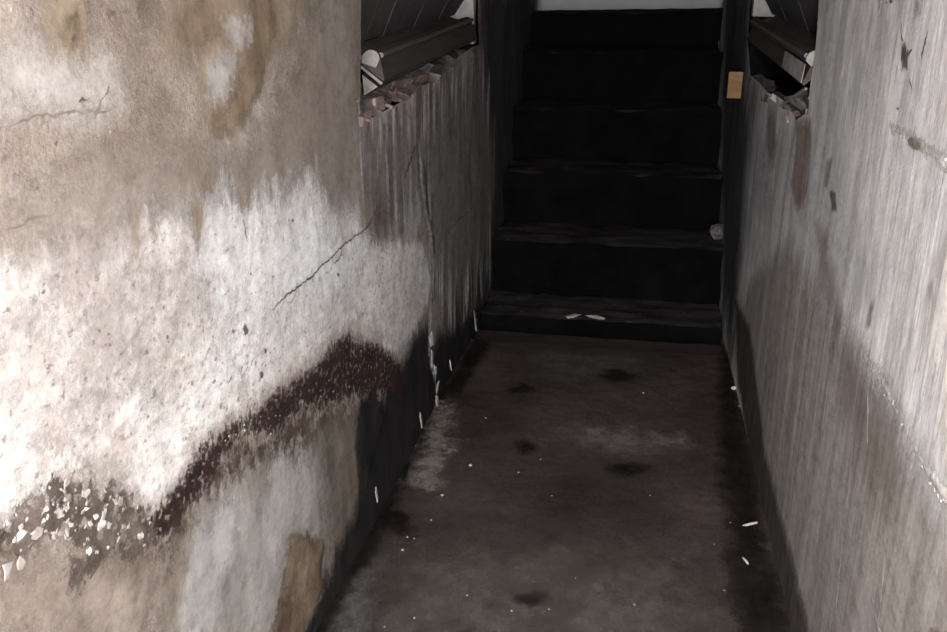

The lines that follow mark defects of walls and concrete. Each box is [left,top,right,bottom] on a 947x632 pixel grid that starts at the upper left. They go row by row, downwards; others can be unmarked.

crack [7,86,114,129]
spalling [358,49,475,127]
spalling [750,74,810,126]
crack [266,203,380,318]
leakage [0,0,734,632]
flaking render [862,346,947,504]
flaking render [0,471,160,595]